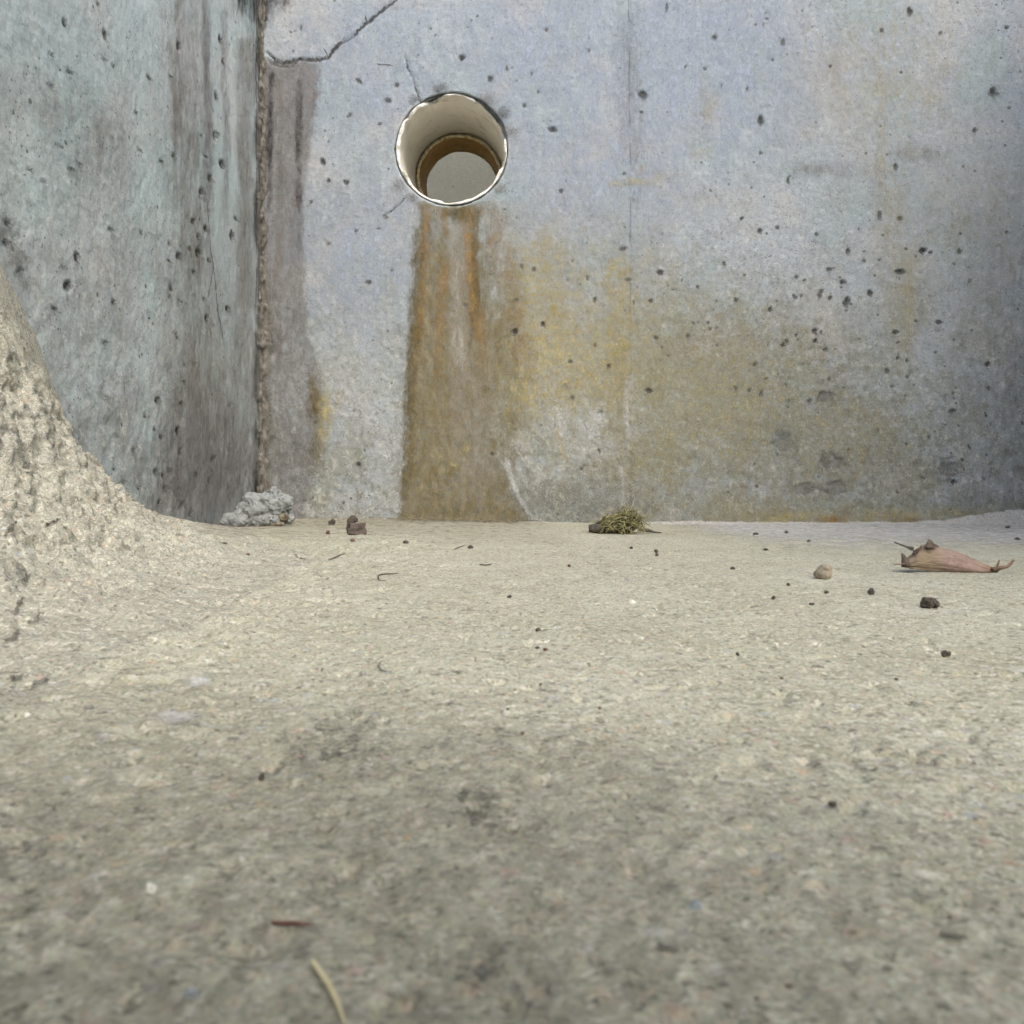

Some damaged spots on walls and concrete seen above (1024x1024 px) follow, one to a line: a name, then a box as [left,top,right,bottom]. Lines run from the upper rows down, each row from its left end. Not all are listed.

damp [238,0,286,24]
crack [254,0,397,493]
corrosion [399,150,525,522]